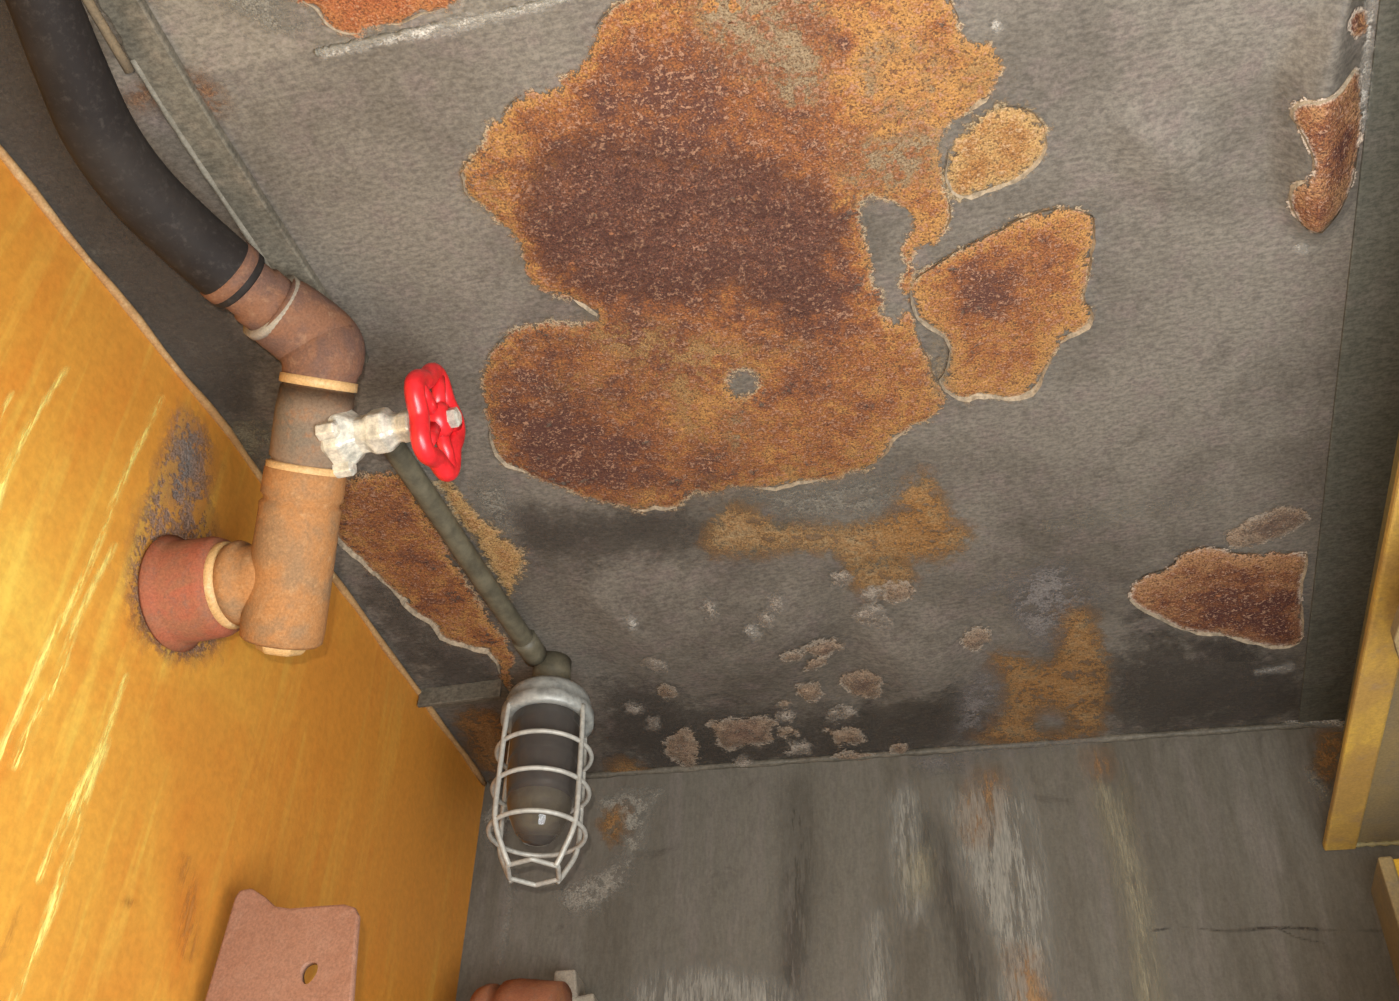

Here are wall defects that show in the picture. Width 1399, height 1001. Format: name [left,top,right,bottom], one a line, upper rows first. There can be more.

rust [288,0,457,40]
rust [1347,6,1369,40]
rust [1285,66,1364,233]
rust [460,0,1096,627]
rust [338,469,530,692]
rust [1128,505,1312,649]
rust [626,637,908,769]